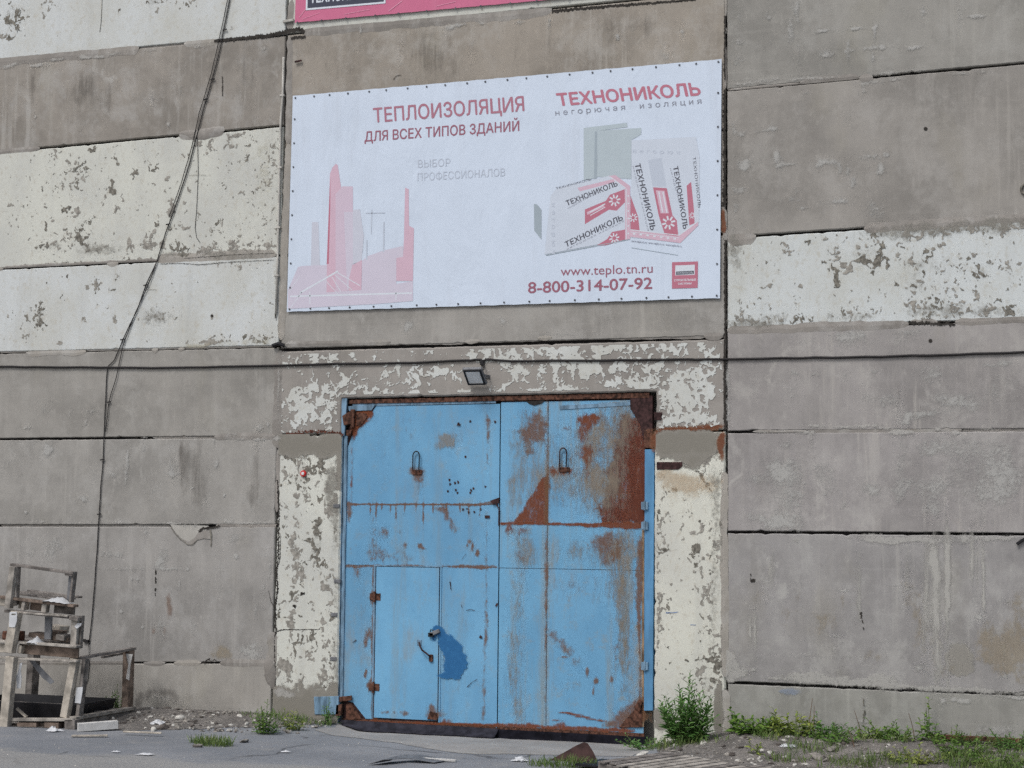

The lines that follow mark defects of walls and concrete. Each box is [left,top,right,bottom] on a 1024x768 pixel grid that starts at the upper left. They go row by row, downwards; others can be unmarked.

peeling [7,131,280,324]
peeling [771,218,1024,322]
peeling [7,301,48,339]
peeling [186,322,276,346]
peeling [726,283,815,327]
corrosion [286,410,373,438]
spalling [170,524,220,546]
corrosion [347,502,492,522]
peeling [273,342,725,732]
corrosion [500,407,726,654]
corrosion [346,552,420,653]
corrosion [356,667,650,733]